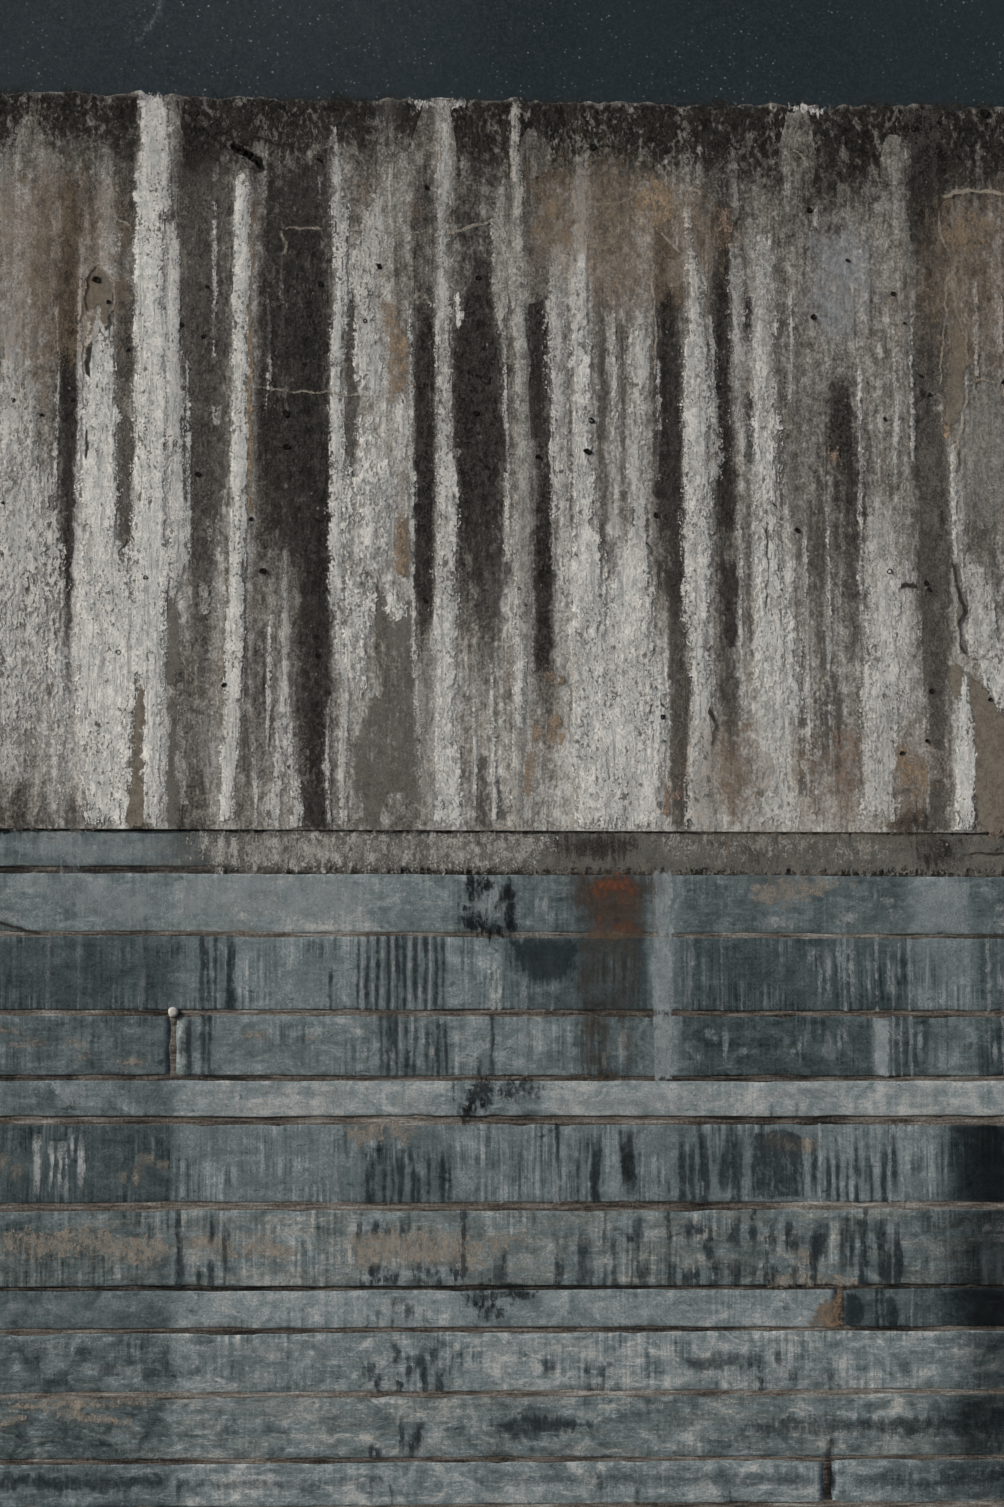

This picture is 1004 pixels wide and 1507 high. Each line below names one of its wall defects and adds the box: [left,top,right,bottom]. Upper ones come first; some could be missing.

water stain [0,95,304,827]
water stain [318,97,1004,841]
peeling [947,640,1004,835]
water stain [968,1126,1004,1214]
water stain [744,1383,1004,1452]